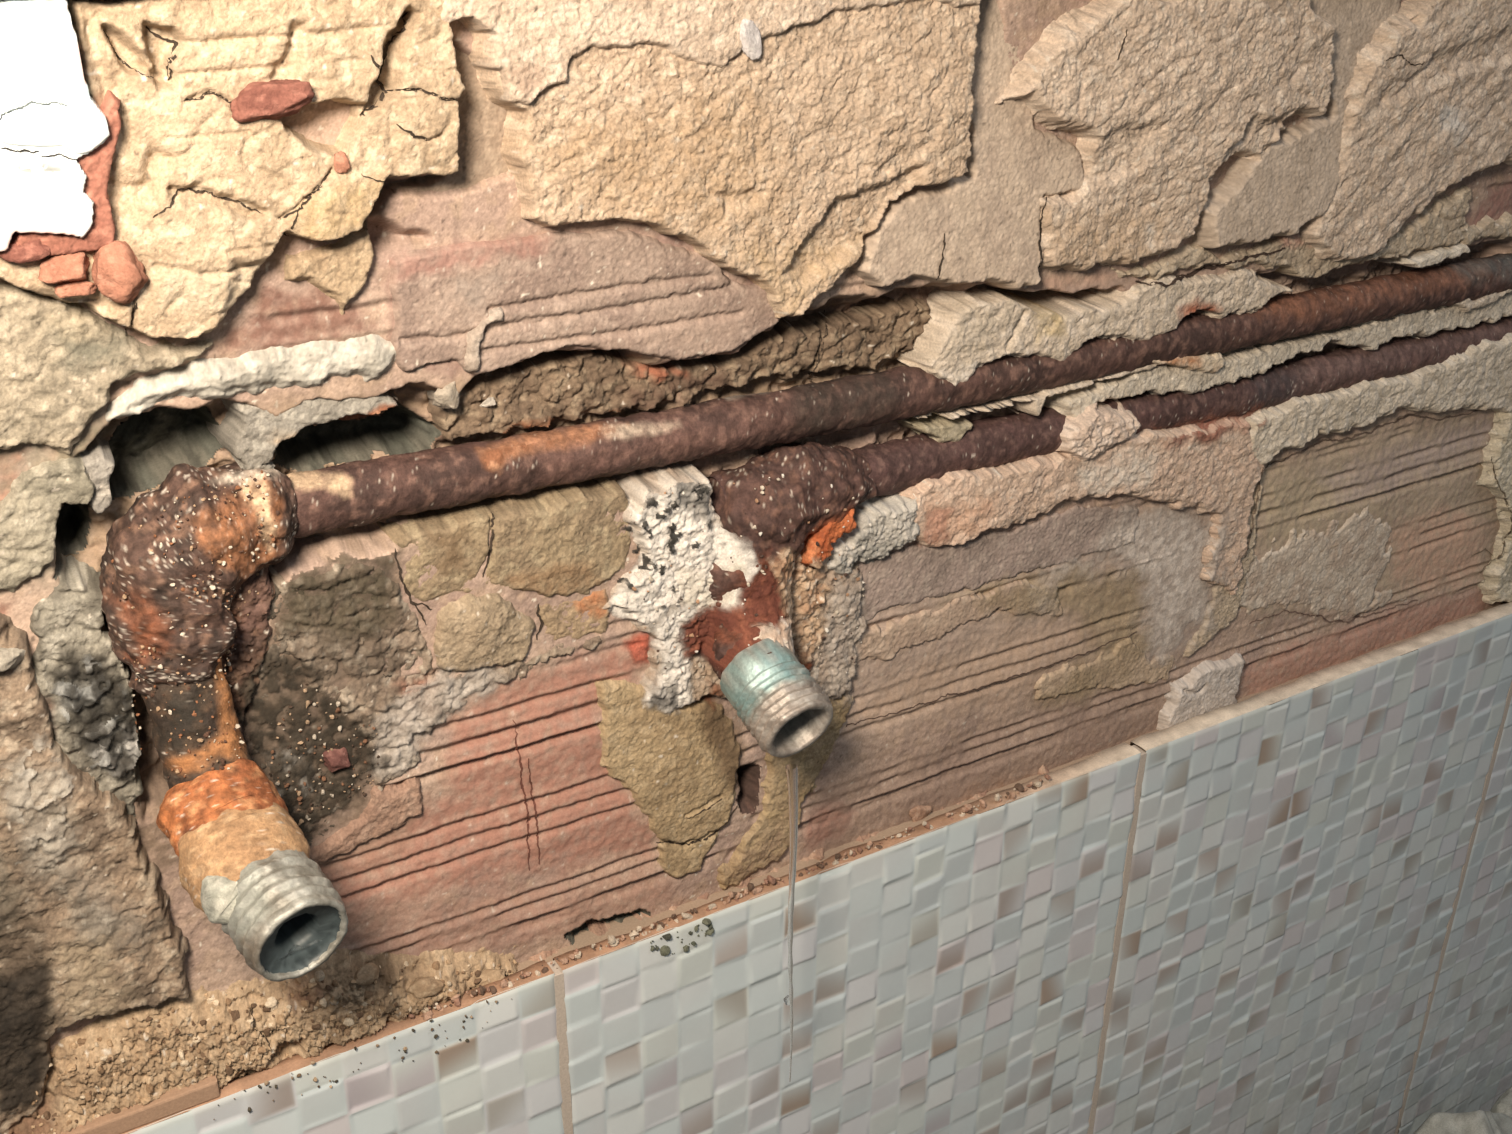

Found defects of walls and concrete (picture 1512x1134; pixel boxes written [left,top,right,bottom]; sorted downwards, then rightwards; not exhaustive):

crack [102,26,231,103]
crack [361,12,457,141]
spalling [10,90,121,256]
crack [153,171,385,236]
spalling [108,406,223,504]
spalling [273,402,442,472]
spalling [54,503,92,580]
corrosion [800,508,856,569]
corrosion [222,565,275,742]
corrosion [681,560,789,700]
damp [236,654,505,837]
damp [0,964,50,1112]